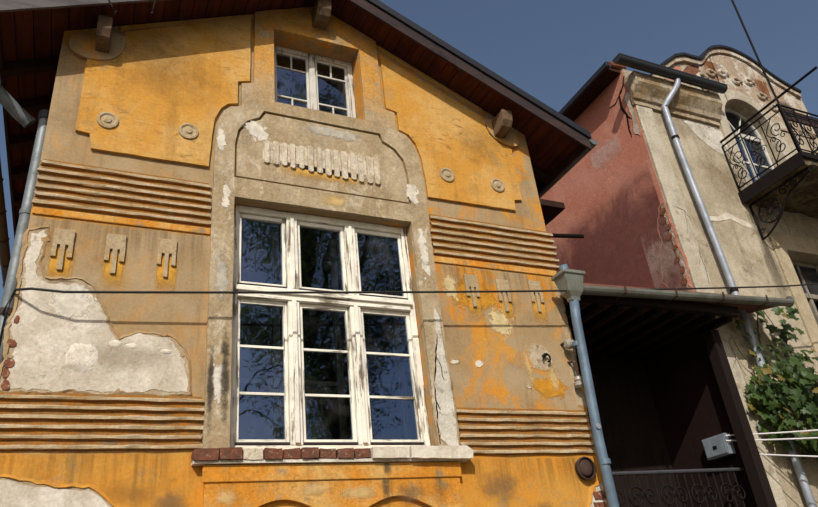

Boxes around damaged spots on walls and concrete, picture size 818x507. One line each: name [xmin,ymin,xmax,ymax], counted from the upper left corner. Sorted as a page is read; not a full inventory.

peeling [244,121,269,142]
peeling [406,184,419,206]
spalling [657,200,695,292]
peeling [0,226,193,397]
peeling [527,343,554,372]
crack [433,337,444,444]
peeling [0,474,128,507]